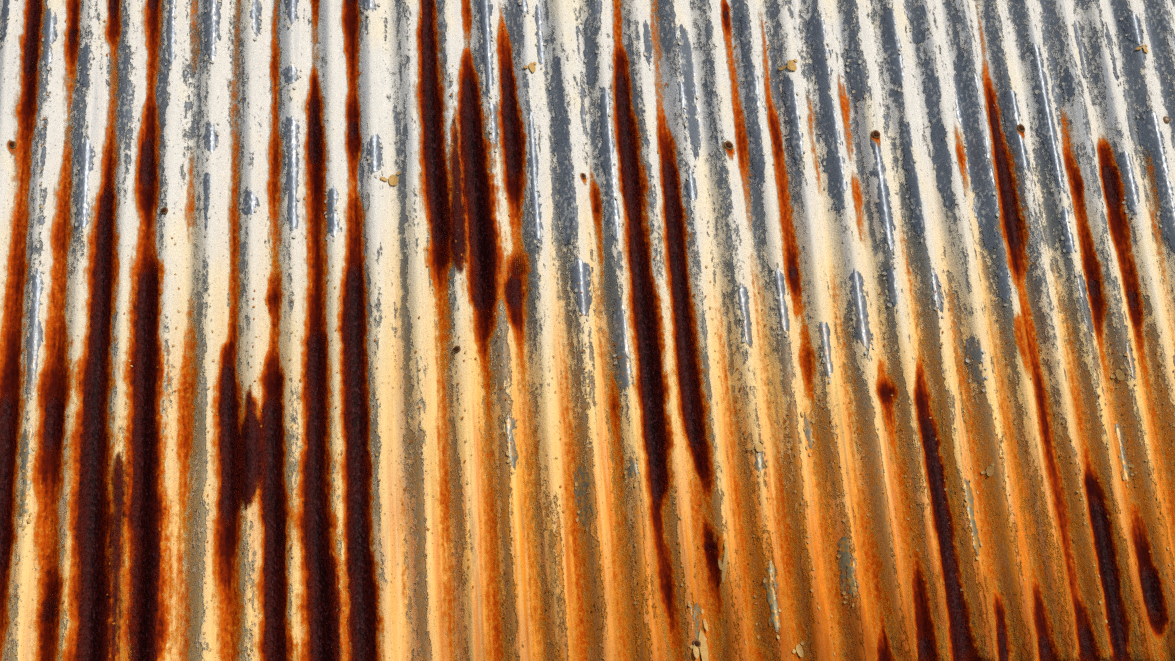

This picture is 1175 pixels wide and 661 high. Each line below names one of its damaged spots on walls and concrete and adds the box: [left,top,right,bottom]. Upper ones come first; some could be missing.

corrosion [0,0,200,661]
corrosion [211,0,385,661]
corrosion [416,0,552,661]
peeling [518,0,593,323]
corrosion [612,0,770,661]
peeling [738,14,767,192]
peeling [778,10,866,219]
peeling [847,137,899,373]
corrosion [876,295,1019,661]
peeling [880,3,1030,348]
corrosion [977,13,1175,661]
peeling [1116,110,1175,252]